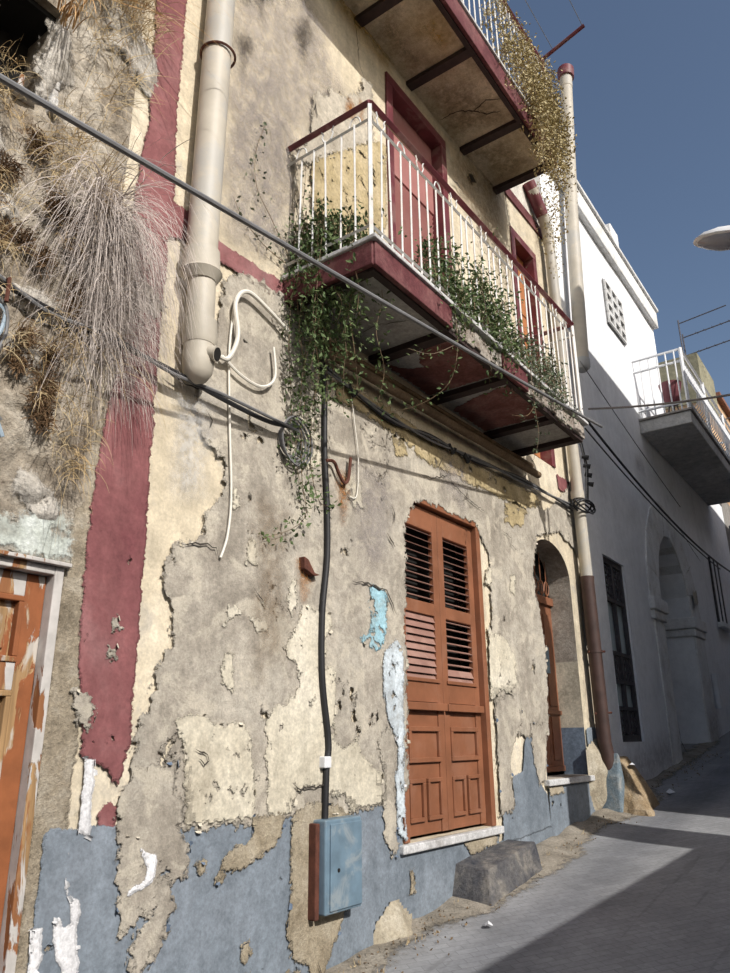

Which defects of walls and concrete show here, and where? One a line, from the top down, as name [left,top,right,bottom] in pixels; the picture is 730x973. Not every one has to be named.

crack [440,98,500,120]
flaking render [12,466,63,521]
spalling [105,613,124,663]
peeling [113,271,585,973]
spalling [70,687,98,734]
peeling [77,756,98,841]
peeling [27,880,81,973]